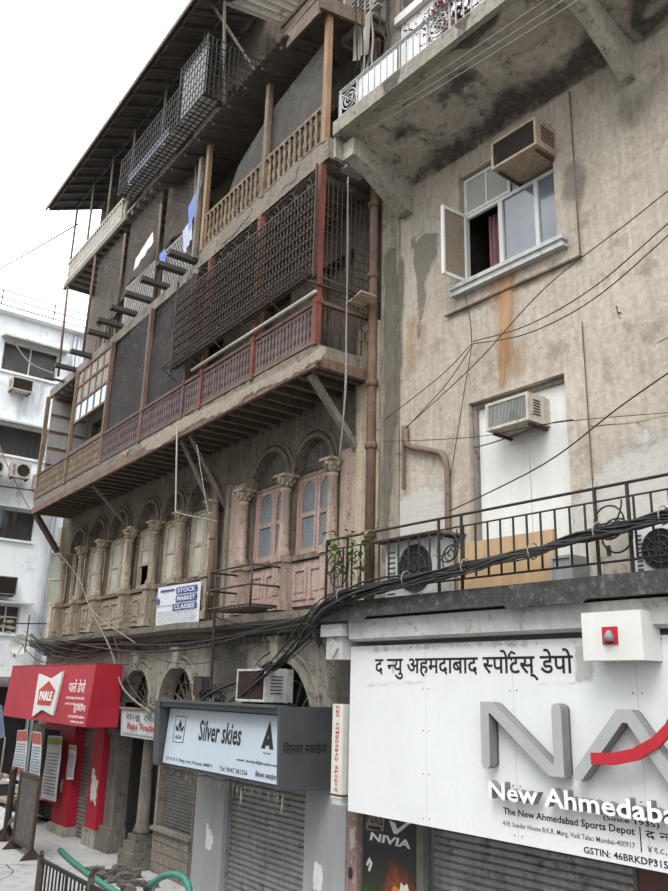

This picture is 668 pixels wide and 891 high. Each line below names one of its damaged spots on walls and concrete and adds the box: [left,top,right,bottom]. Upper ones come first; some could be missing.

leakage [631,0,668,38]
leakage [383,69,400,93]
leakage [415,38,606,180]
leakage [564,162,584,197]
rust [489,273,513,386]